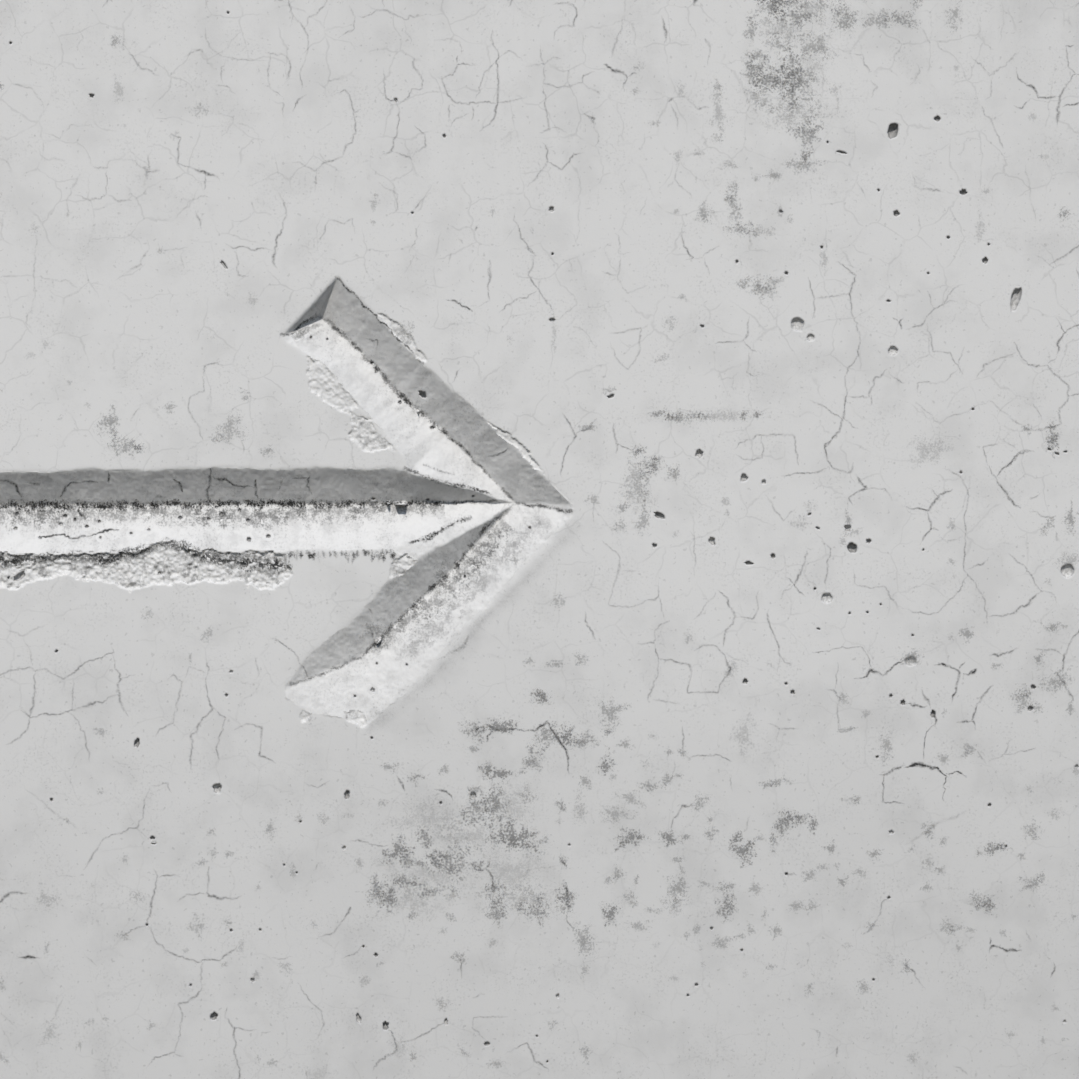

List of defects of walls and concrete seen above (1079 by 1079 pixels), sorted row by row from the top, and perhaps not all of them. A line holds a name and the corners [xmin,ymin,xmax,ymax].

crack [42,478,113,539]
leakage [475,720,517,732]
crack [895,705,962,784]
leakage [491,825,536,851]
leakage [730,833,756,866]
leakage [776,812,816,834]